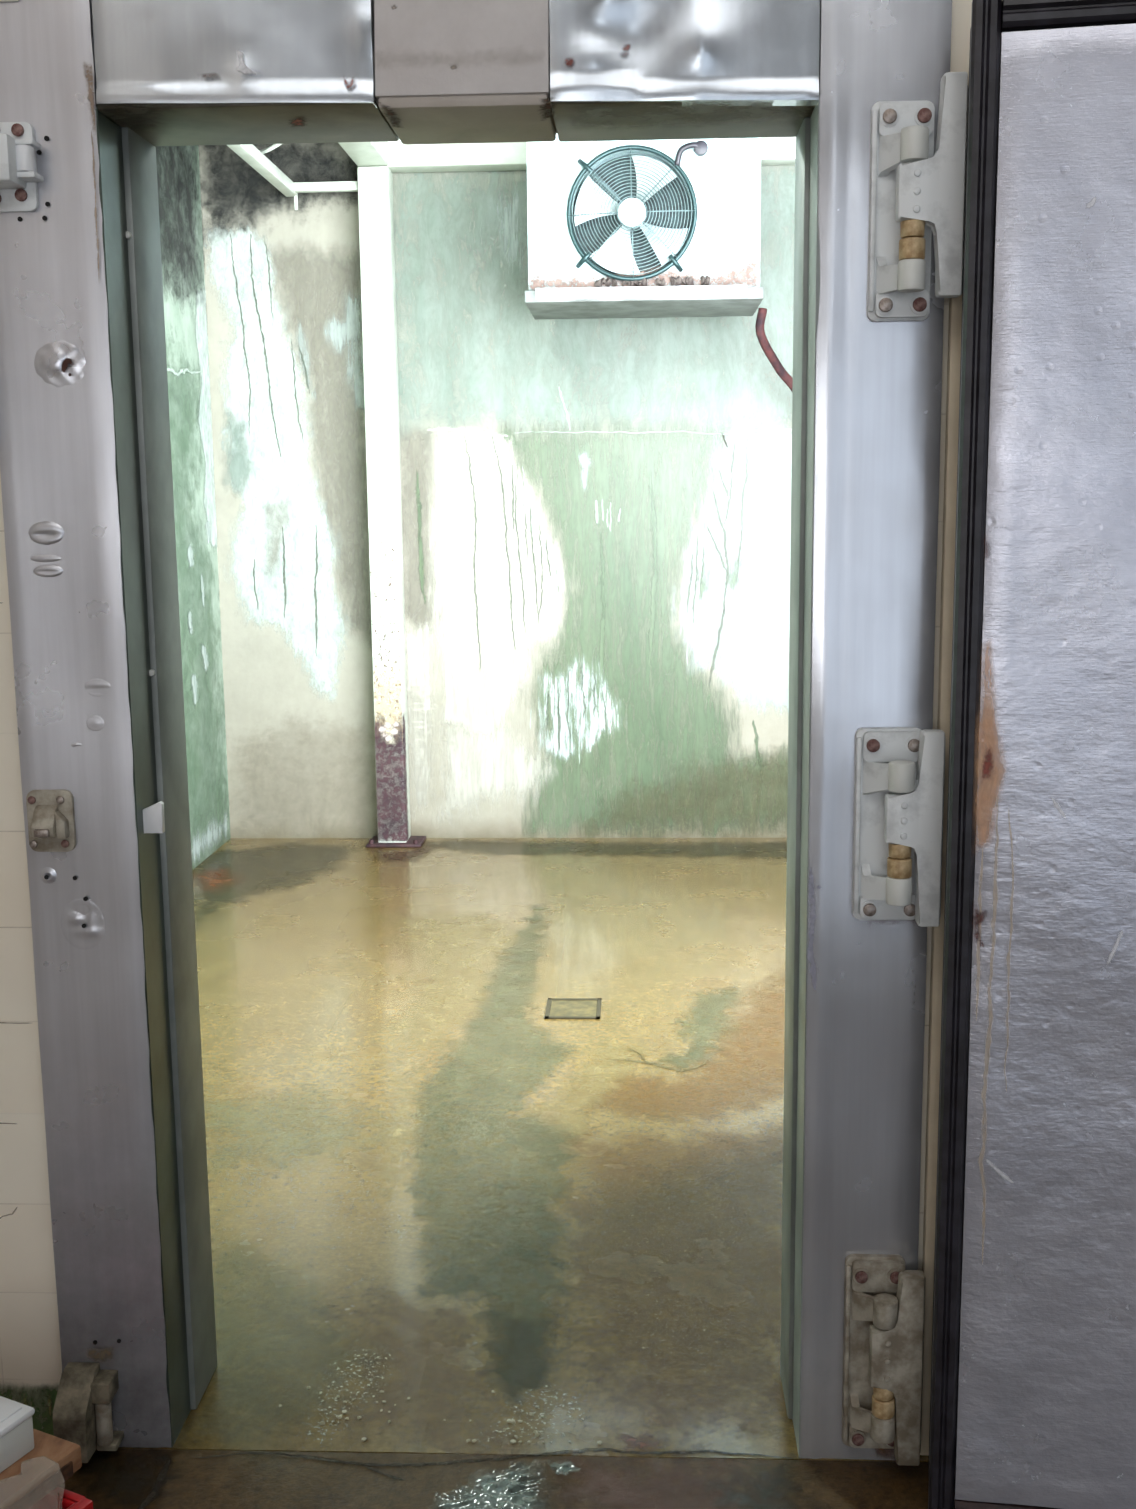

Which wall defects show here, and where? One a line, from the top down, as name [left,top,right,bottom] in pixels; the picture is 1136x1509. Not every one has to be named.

flaking render [374,0,556,145]
damp [155,143,369,698]
corrosion [369,540,432,861]
damp [394,168,795,837]
corrosion [973,651,1014,1104]
damp [409,906,577,1390]